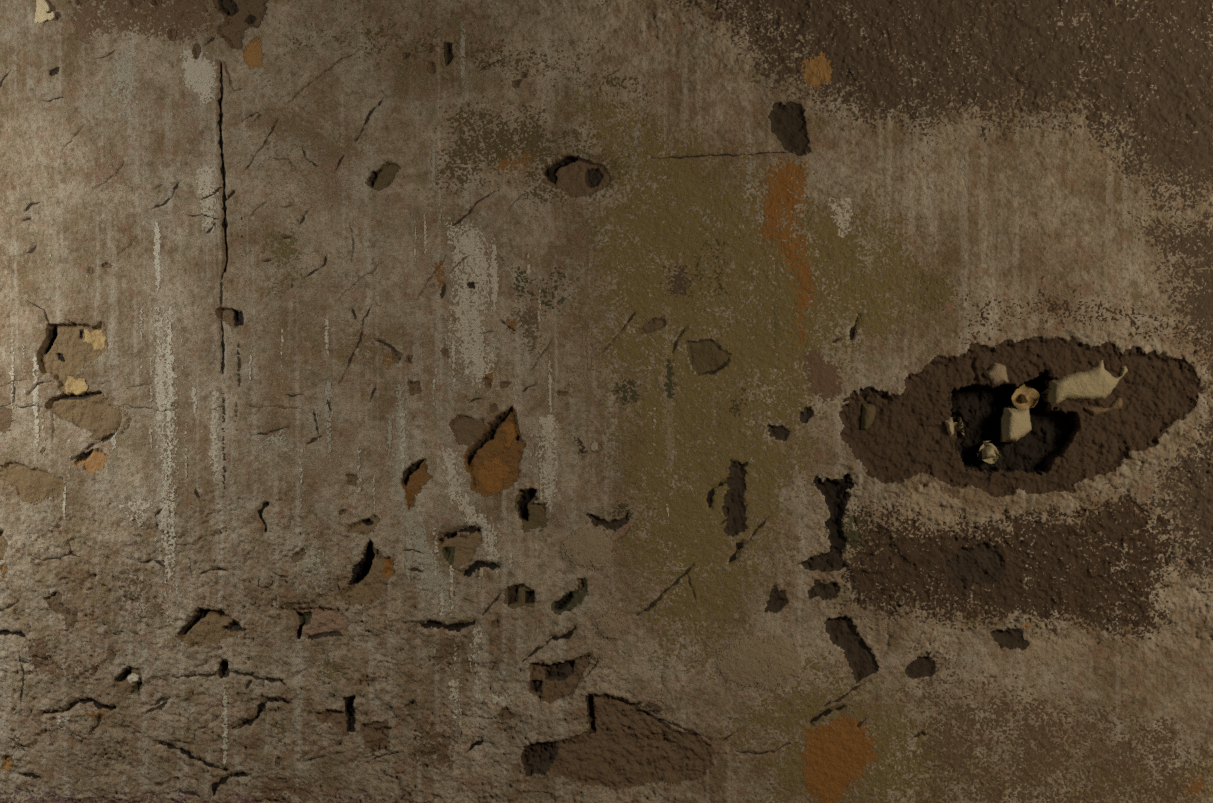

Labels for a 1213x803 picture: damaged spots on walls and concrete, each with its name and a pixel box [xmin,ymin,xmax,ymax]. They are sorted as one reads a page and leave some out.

crack [152,38,384,372]
spalling [366,162,400,191]
spalling [542,156,612,198]
spalling [37,321,123,473]
crack [212,223,400,444]
spalling [401,459,432,509]
spalling [449,406,547,533]
spalling [811,474,857,555]
spalling [839,336,1205,497]